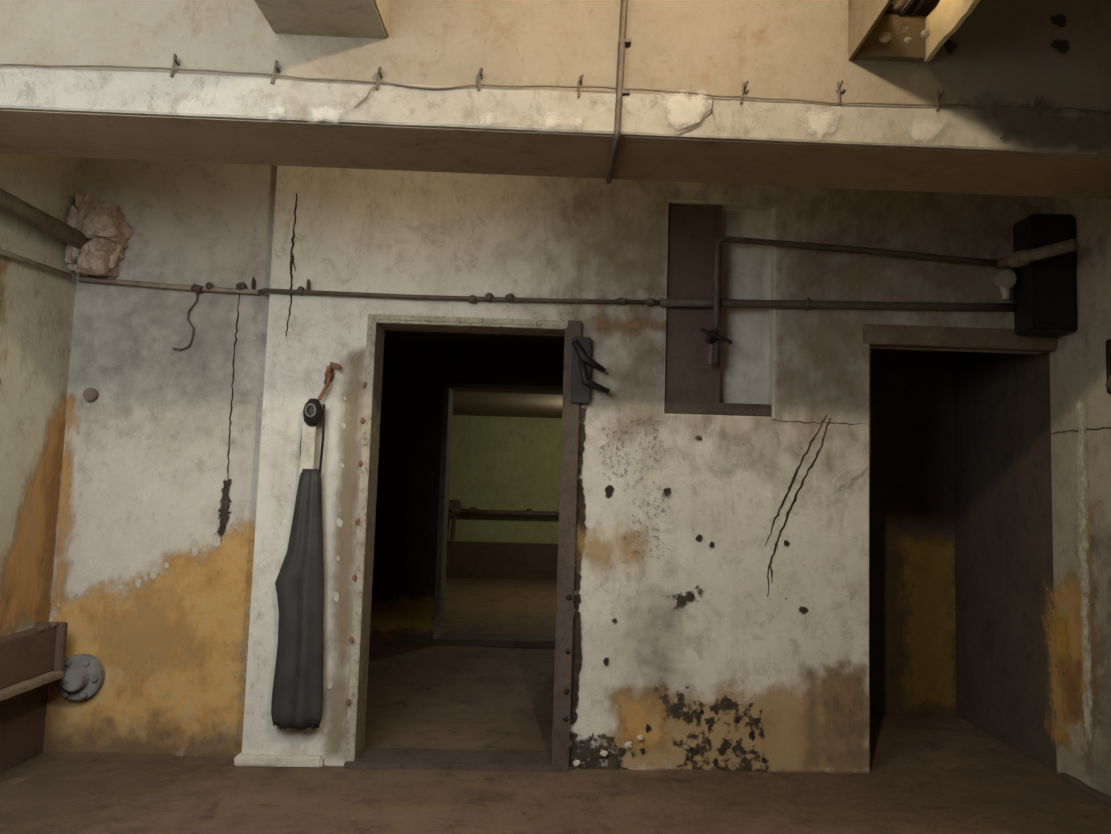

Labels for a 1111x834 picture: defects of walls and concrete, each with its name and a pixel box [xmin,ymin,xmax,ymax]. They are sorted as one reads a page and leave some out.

peeling [664,92,709,128]
peeling [43,479,255,757]
spalling [569,408,652,770]
spalling [668,585,703,609]
crack [765,414,869,597]
corrosion [1042,510,1101,762]
spalling [654,686,770,772]